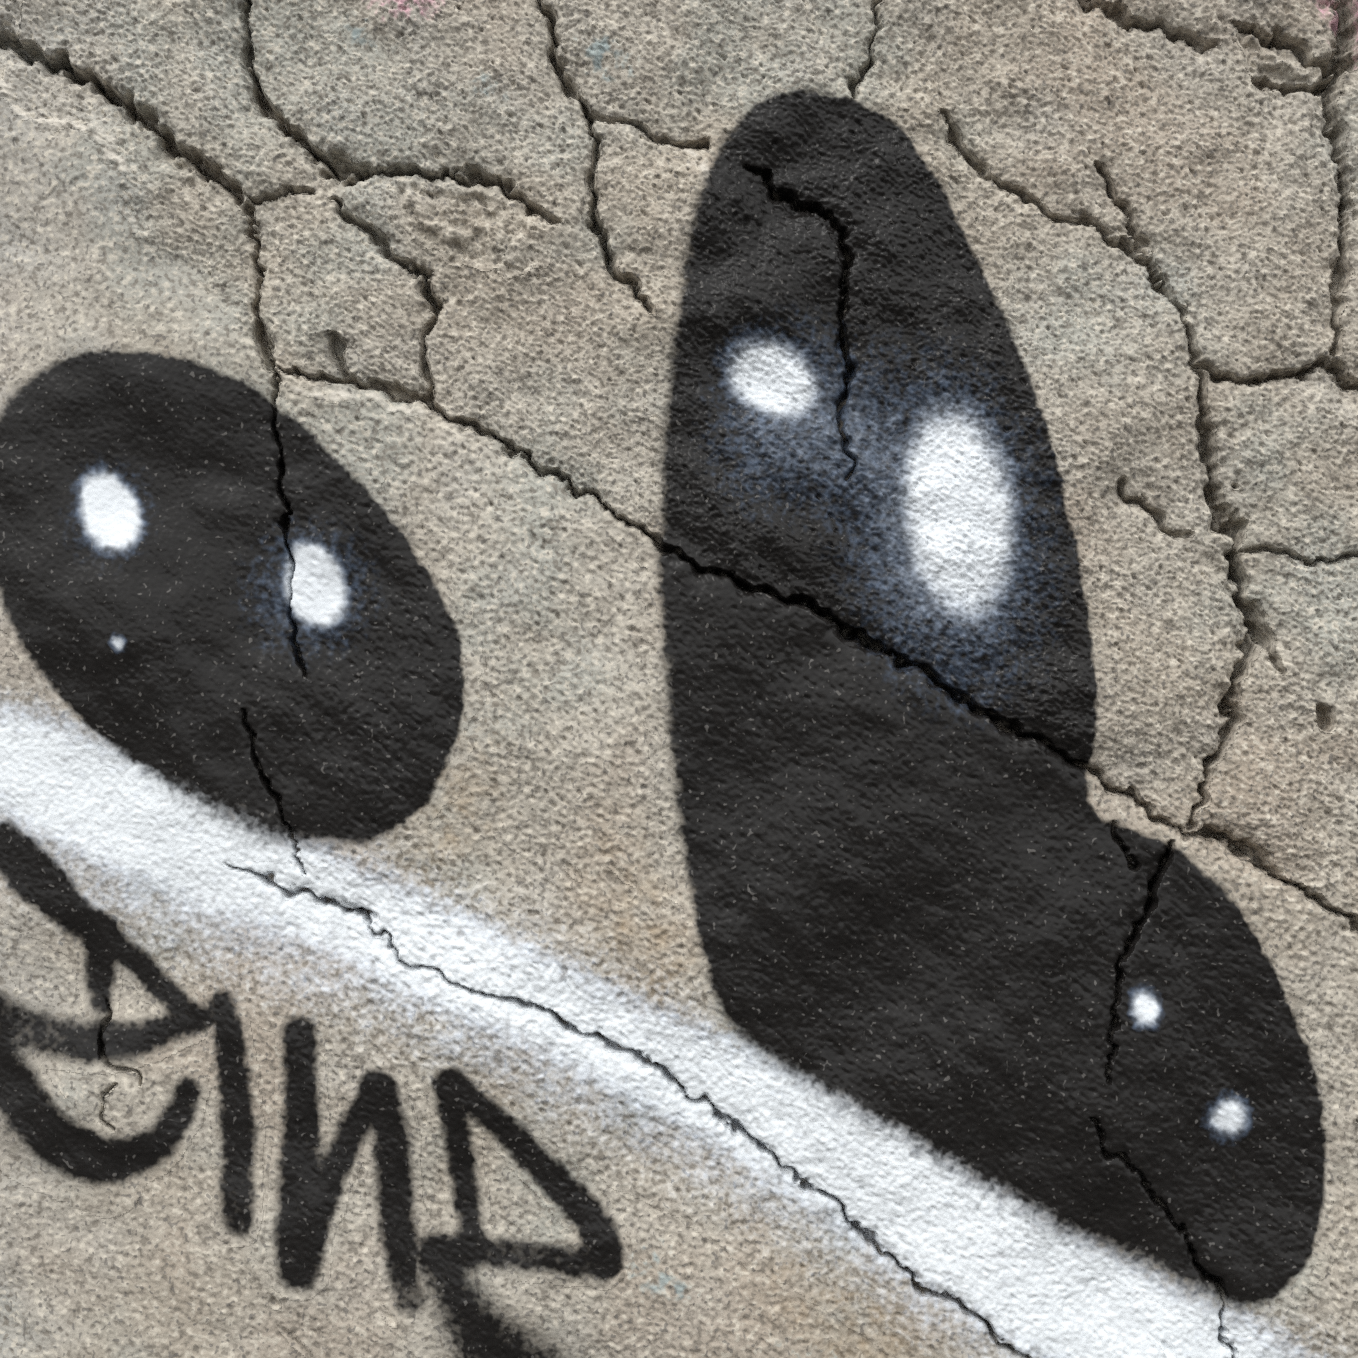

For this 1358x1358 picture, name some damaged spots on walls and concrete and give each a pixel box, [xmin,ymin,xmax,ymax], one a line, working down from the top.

crack [0,0,1358,1085]
crack [97,998,143,1133]
crack [222,708,1032,1358]
crack [1088,1117,1238,1358]